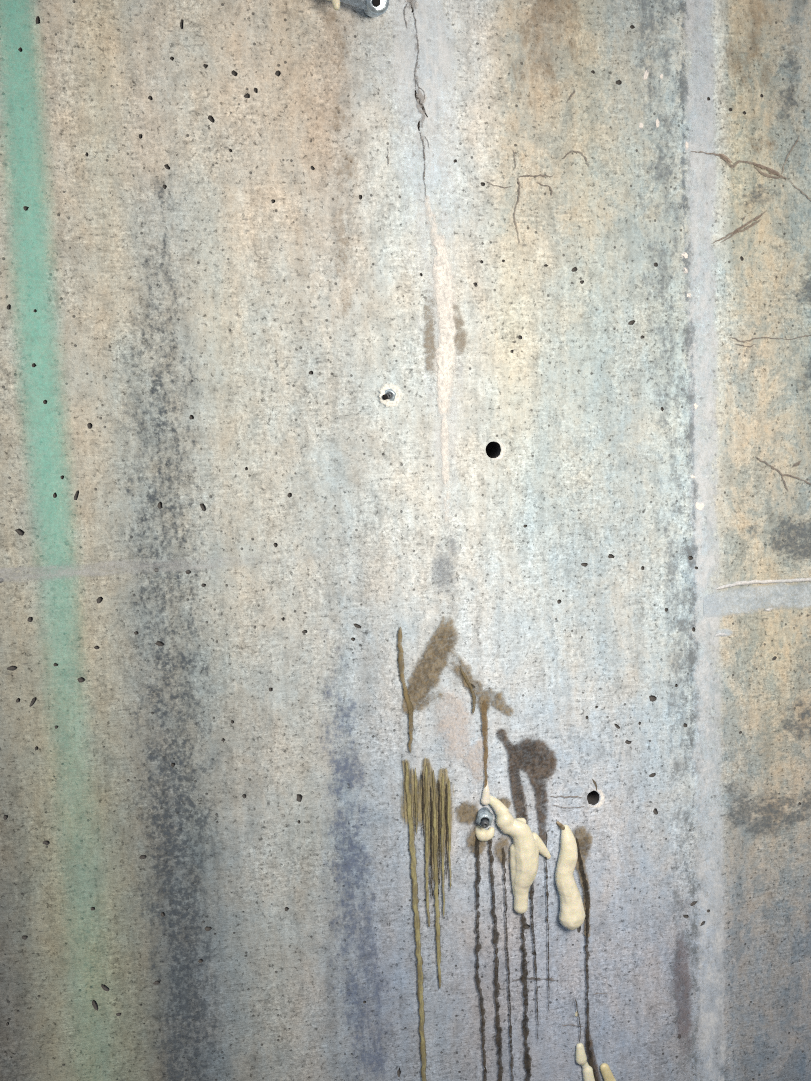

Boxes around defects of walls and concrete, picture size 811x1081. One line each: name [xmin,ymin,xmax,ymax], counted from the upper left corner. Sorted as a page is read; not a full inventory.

crack [404,0,429,195]
water stain [397,619,557,1081]
water stain [573,826,600,1081]